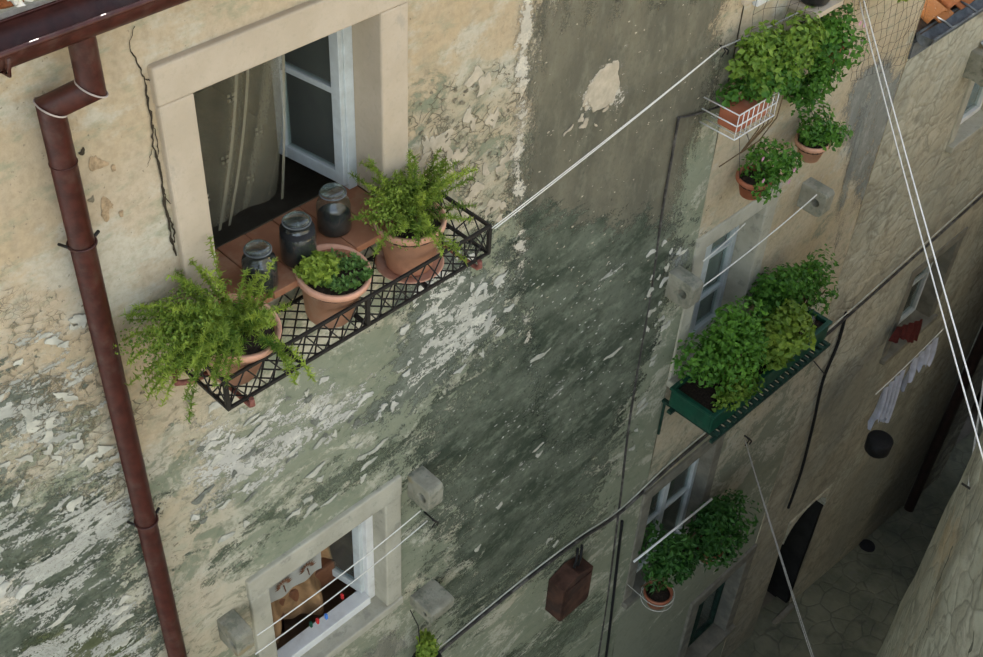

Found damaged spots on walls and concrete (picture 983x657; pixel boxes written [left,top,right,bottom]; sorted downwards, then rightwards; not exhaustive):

crack [129,26,177,256]
flaking render [563,60,625,136]
water stain [506,0,730,289]
water stain [839,57,903,211]
peeling [181,65,528,524]
peeling [0,305,127,521]
peeling [0,575,35,621]
peeling [46,605,76,629]
water stain [0,464,162,657]
peeling [109,595,134,632]
water stain [191,490,231,532]